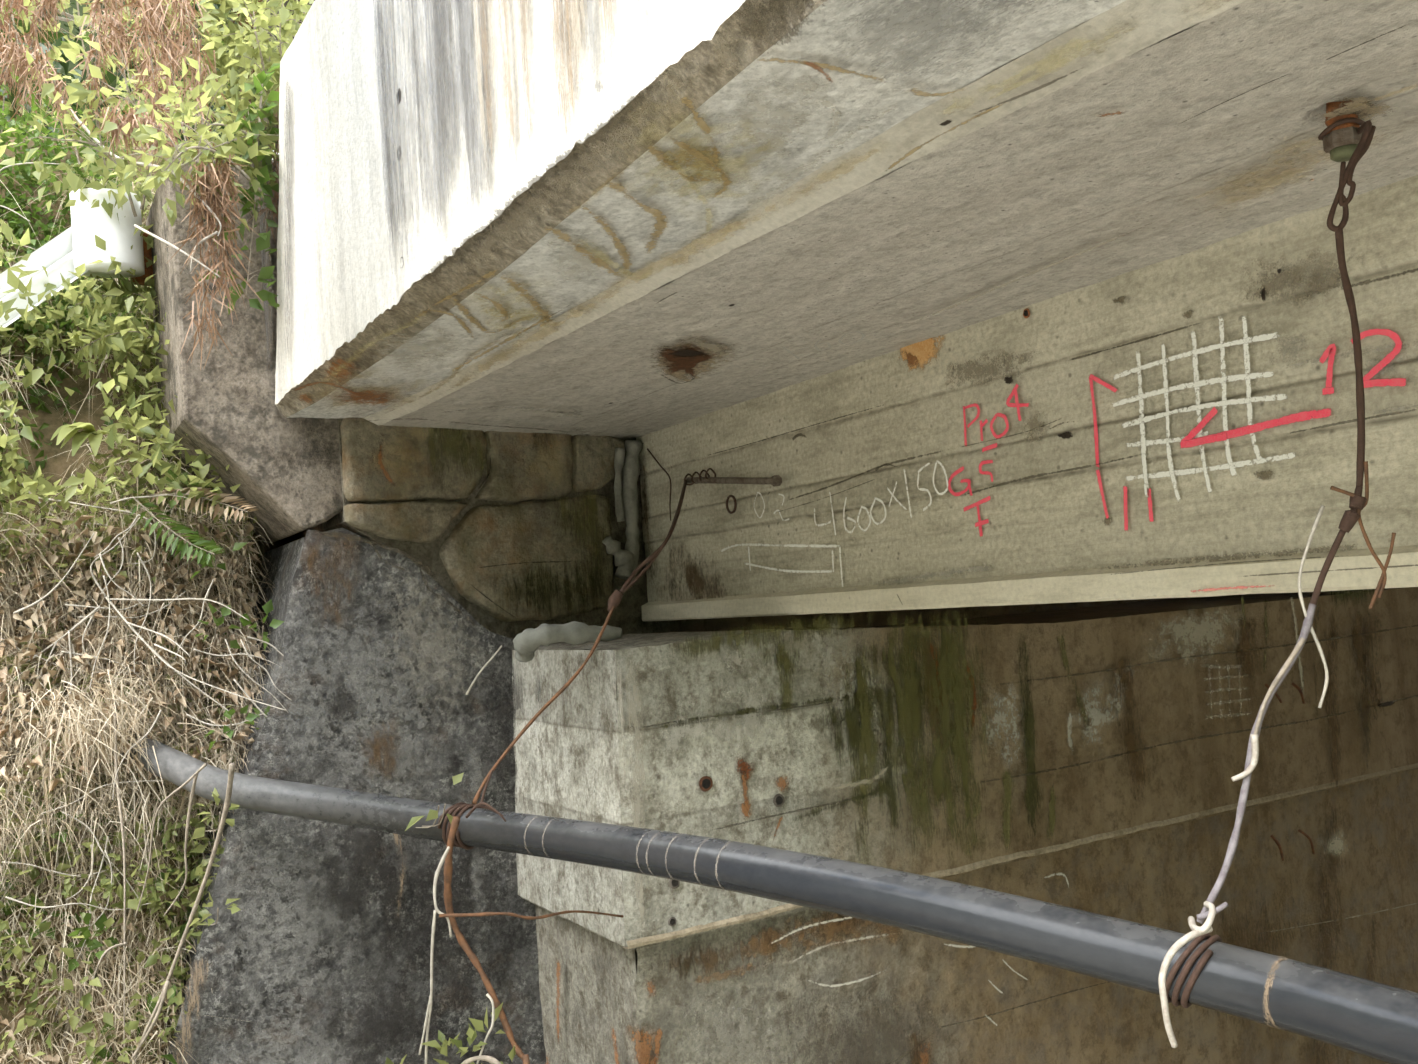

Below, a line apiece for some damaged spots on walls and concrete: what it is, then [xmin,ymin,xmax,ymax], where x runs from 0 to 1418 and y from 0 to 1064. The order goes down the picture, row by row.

water stain [373,0,615,261]
spalling [643,338,731,383]
spalling [900,336,944,370]
water stain [664,614,1056,864]
corrosion [737,758,754,819]